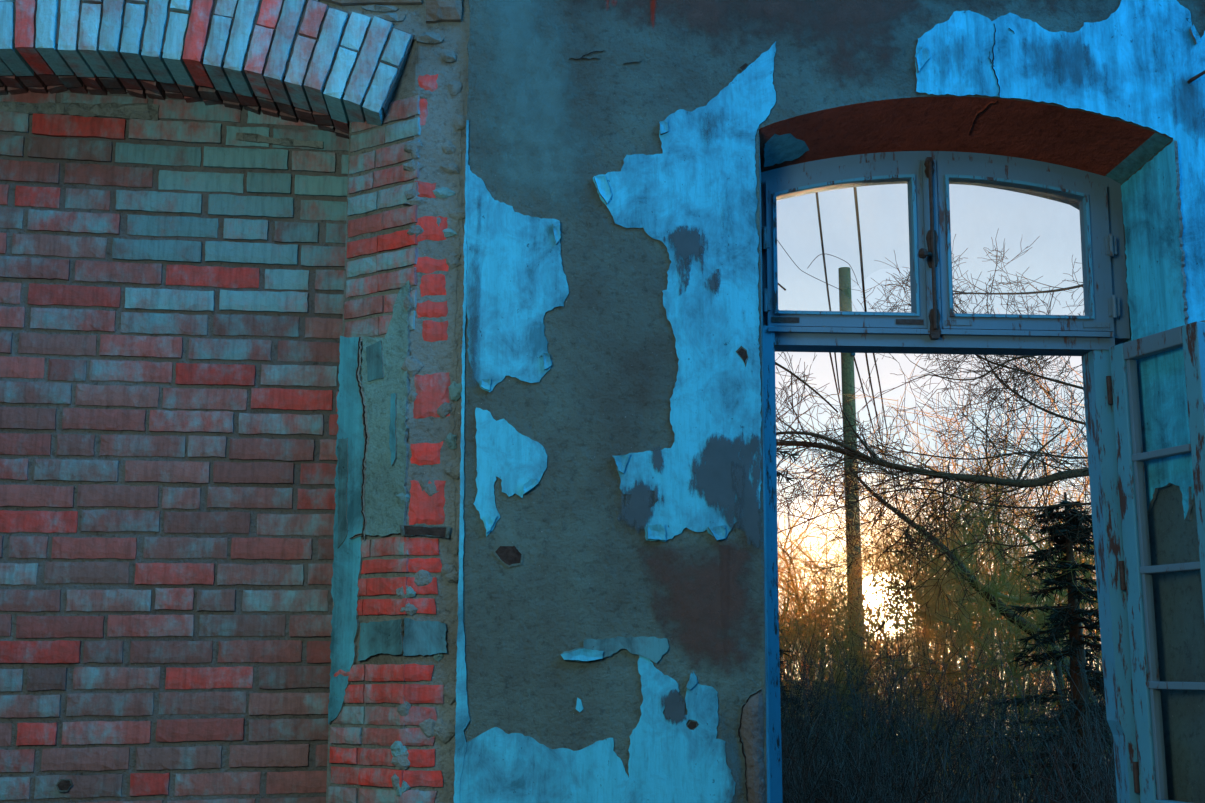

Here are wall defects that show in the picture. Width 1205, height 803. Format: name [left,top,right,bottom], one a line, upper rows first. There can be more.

spalling [328,64,736,803]
peeling [593,42,809,542]
crack [968,23,1015,135]
peeling [914,0,1205,340]
peeling [1136,347,1195,520]
crack [736,688,762,801]